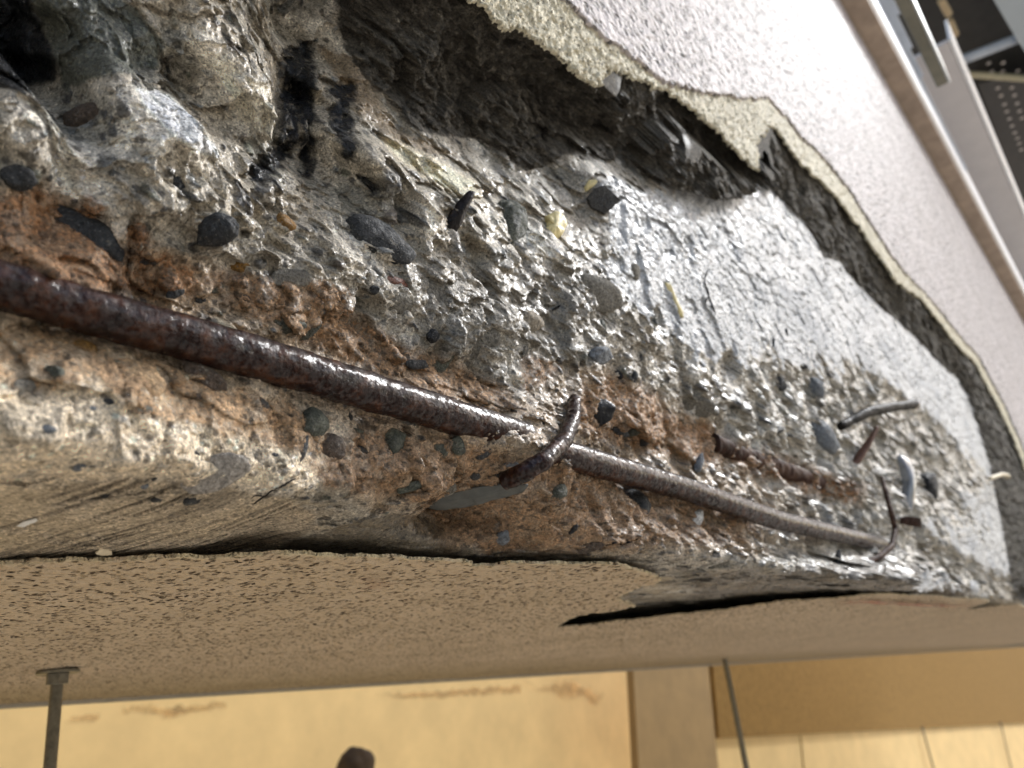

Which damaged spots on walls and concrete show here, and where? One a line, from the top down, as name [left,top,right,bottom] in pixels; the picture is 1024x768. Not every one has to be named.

spalling [0,0,52,89]
spalling [250,41,316,184]
spalling [327,82,357,160]
peeling [466,0,1024,468]
rust [0,190,510,408]
rust [0,327,754,553]
rust [580,378,860,501]
peeling [88,549,112,558]
spalling [684,502,704,526]
spalling [920,472,939,499]
spalling [967,580,979,596]